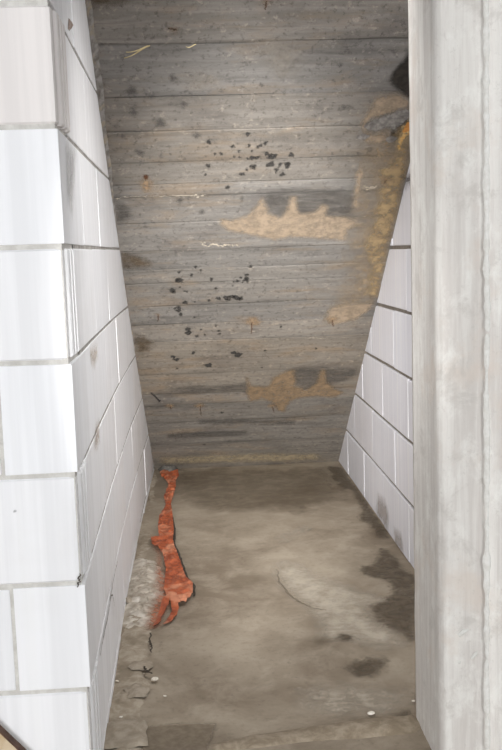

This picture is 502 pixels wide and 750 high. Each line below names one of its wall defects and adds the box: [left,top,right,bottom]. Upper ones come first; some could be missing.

spalling [356,108,409,143]
leakage [221,53,409,325]
leakage [280,548,415,644]
leakage [351,658,387,676]